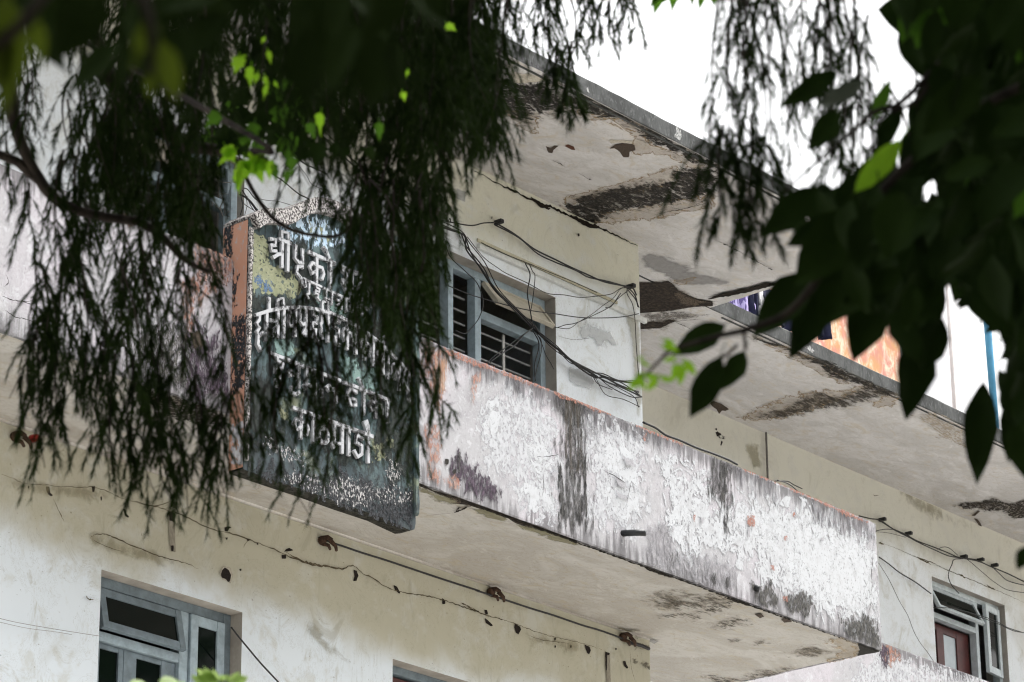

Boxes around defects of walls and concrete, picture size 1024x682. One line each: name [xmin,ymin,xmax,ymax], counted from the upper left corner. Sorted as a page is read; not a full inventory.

peeling [610,140,635,157]
spalling [639,277,713,330]
crack [2,474,594,647]
damp [126,225,899,668]
peeling [263,347,880,637]
spalling [954,499,1024,526]